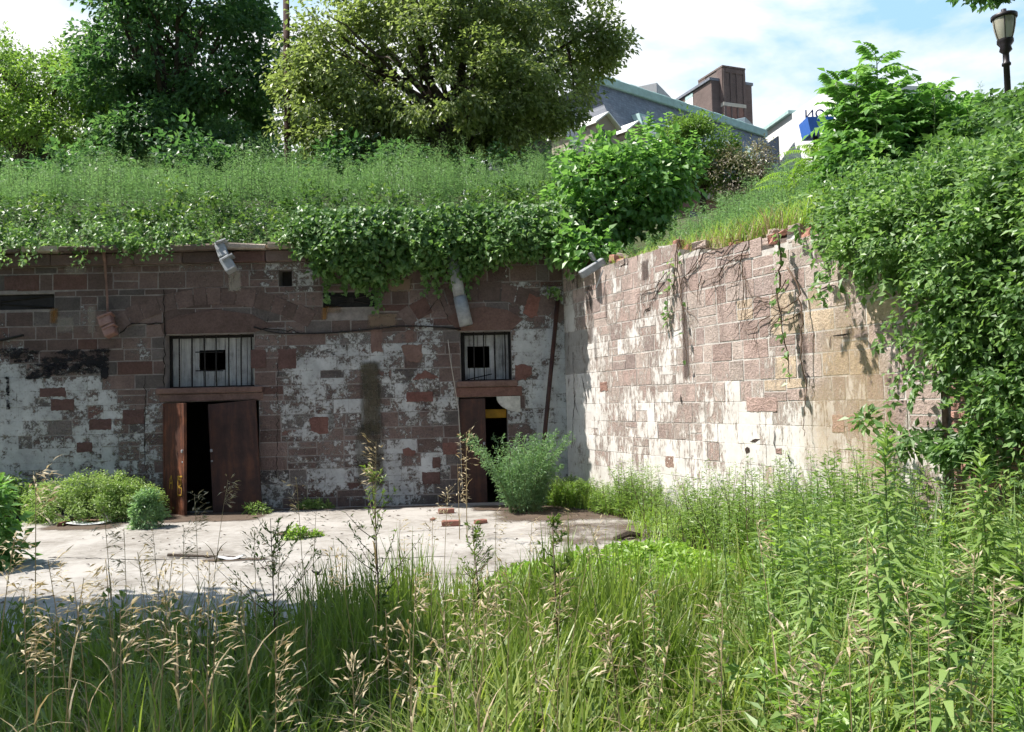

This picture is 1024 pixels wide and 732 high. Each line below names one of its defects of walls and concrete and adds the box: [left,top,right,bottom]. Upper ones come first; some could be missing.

peeling [224,262,322,318]
water stain [0,348,110,380]
peeling [0,340,163,514]
peeling [250,317,458,509]
water stain [357,361,383,485]